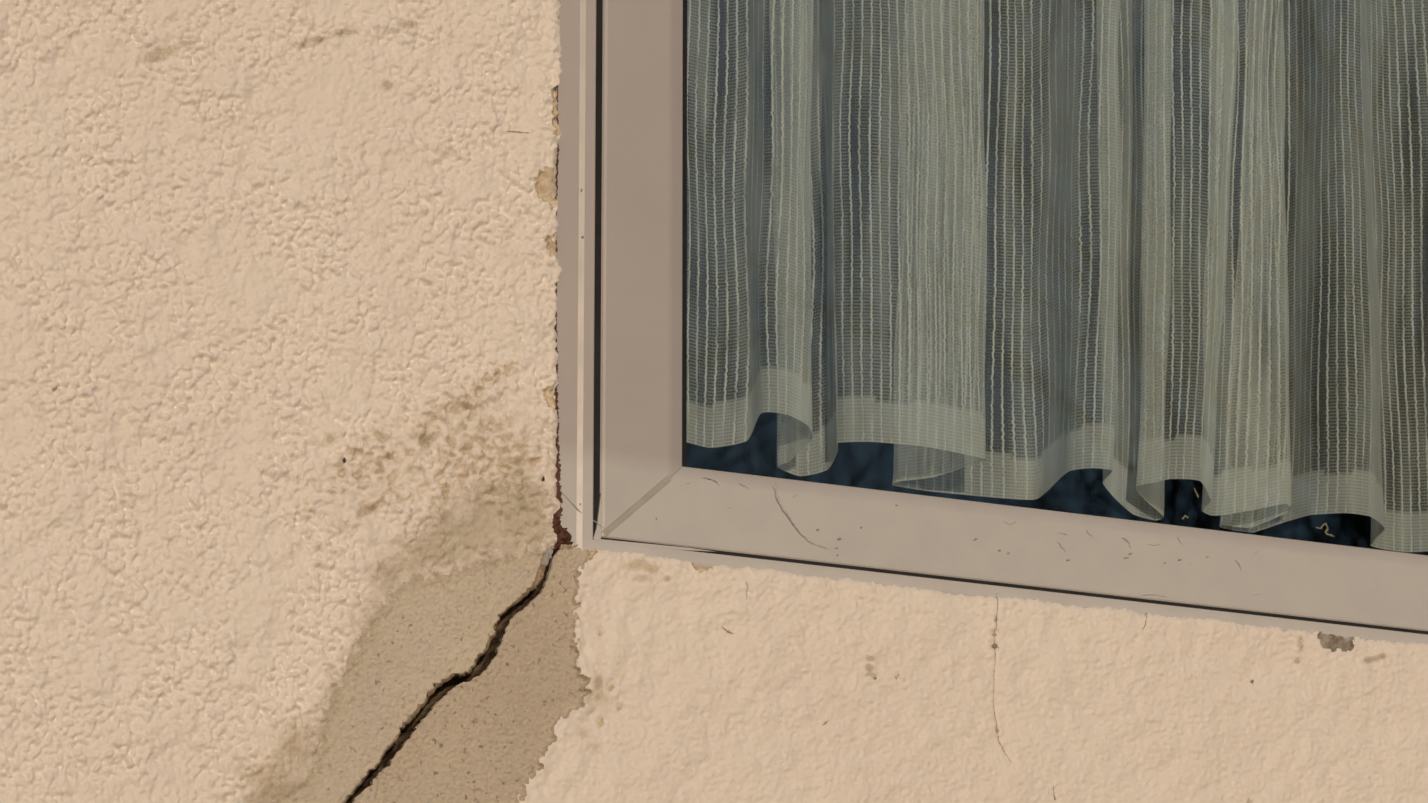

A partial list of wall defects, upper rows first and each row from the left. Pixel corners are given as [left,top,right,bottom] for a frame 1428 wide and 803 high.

peeling [270,547,622,803]
crack [343,541,559,803]
spalling [1317,631,1354,652]